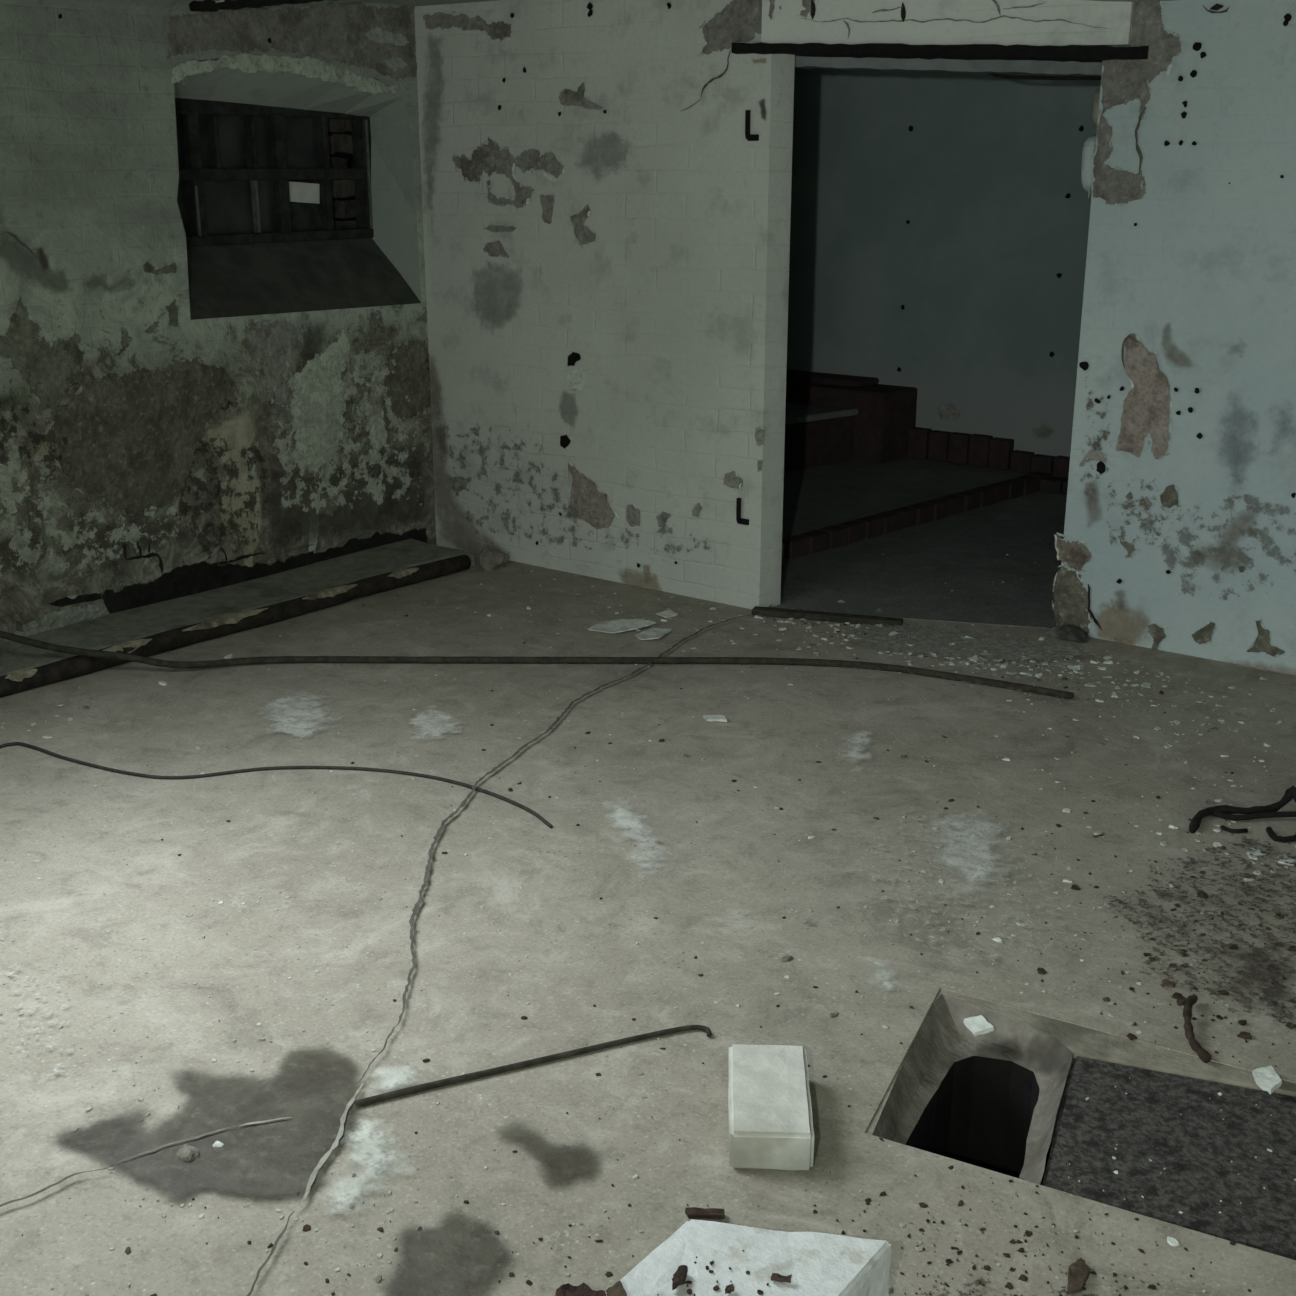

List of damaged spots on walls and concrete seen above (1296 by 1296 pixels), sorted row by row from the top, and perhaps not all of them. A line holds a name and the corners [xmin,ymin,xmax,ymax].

spalling [697,0,782,57]
spalling [1078,1,1206,206]
spalling [452,137,565,224]
spalling [0,295,431,614]
leakage [207,327,639,567]
peeling [1079,333,1199,474]
spalling [1051,533,1093,634]
crack [247,593,784,1296]
leakage [57,1047,394,1210]
leakage [375,1067,413,1089]
leakage [500,1123,597,1184]
leakage [386,1213,507,1296]